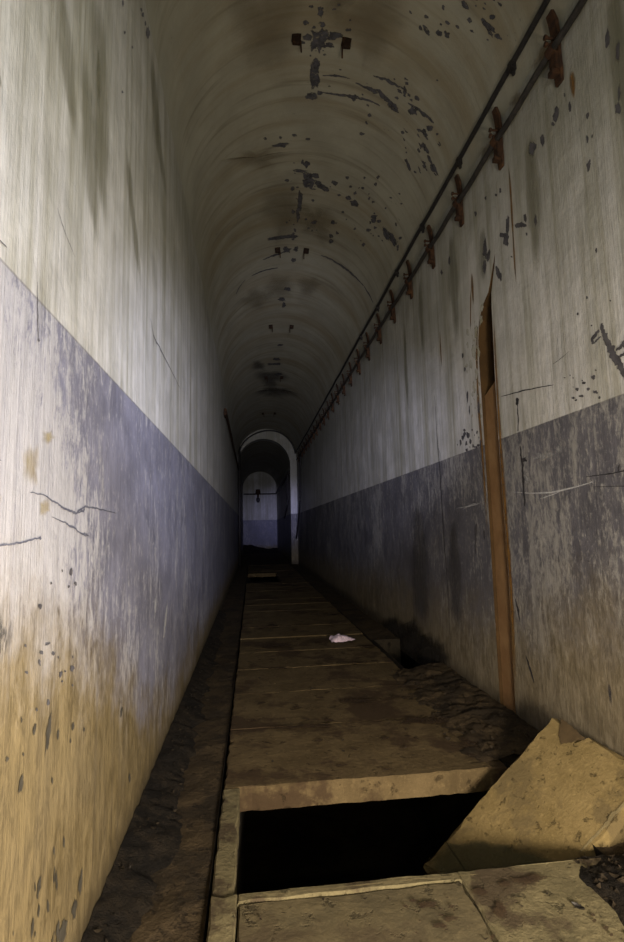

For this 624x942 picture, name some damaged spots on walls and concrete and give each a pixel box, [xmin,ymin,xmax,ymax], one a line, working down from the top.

peeling [419,0,502,41]
peeling [302,4,441,176]
peeling [236,160,402,294]
crack [0,492,115,546]